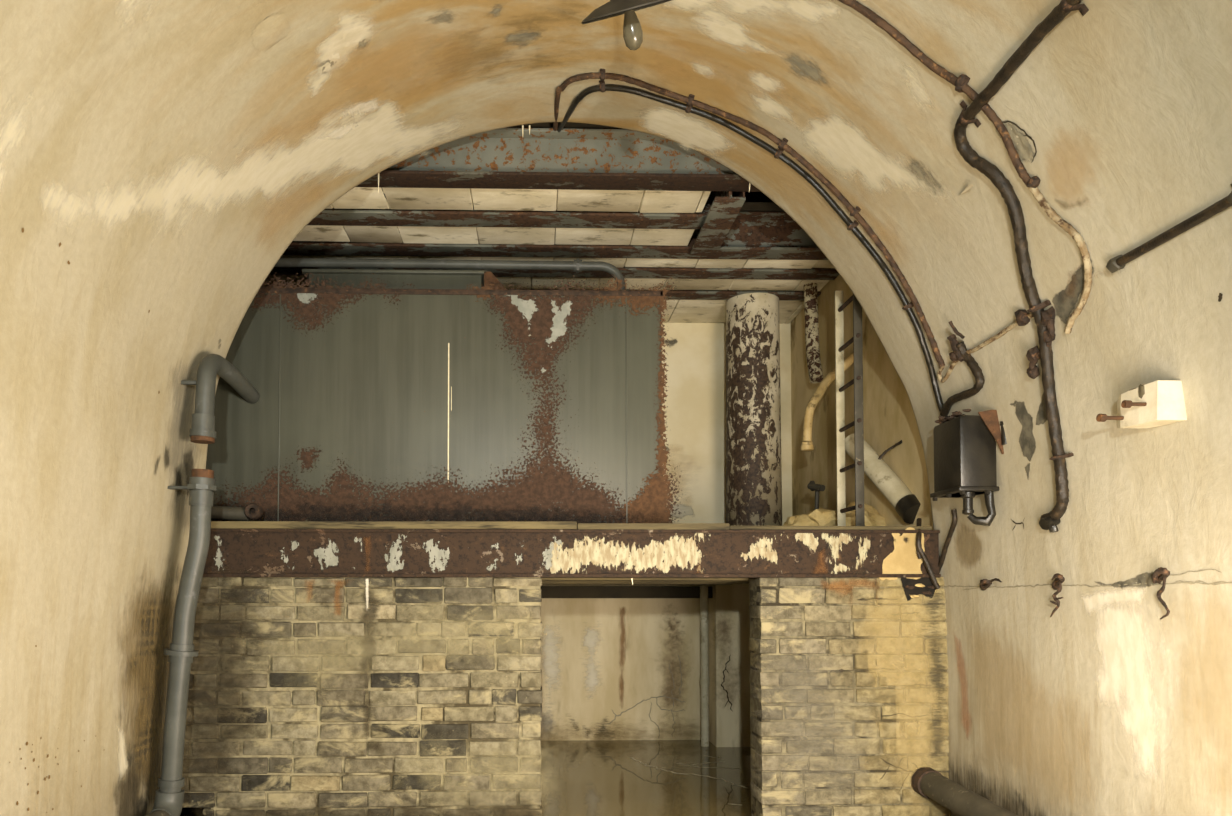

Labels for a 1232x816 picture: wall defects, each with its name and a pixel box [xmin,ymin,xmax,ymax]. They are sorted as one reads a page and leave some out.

rust [213,272,685,524]
damp [118,597,175,816]